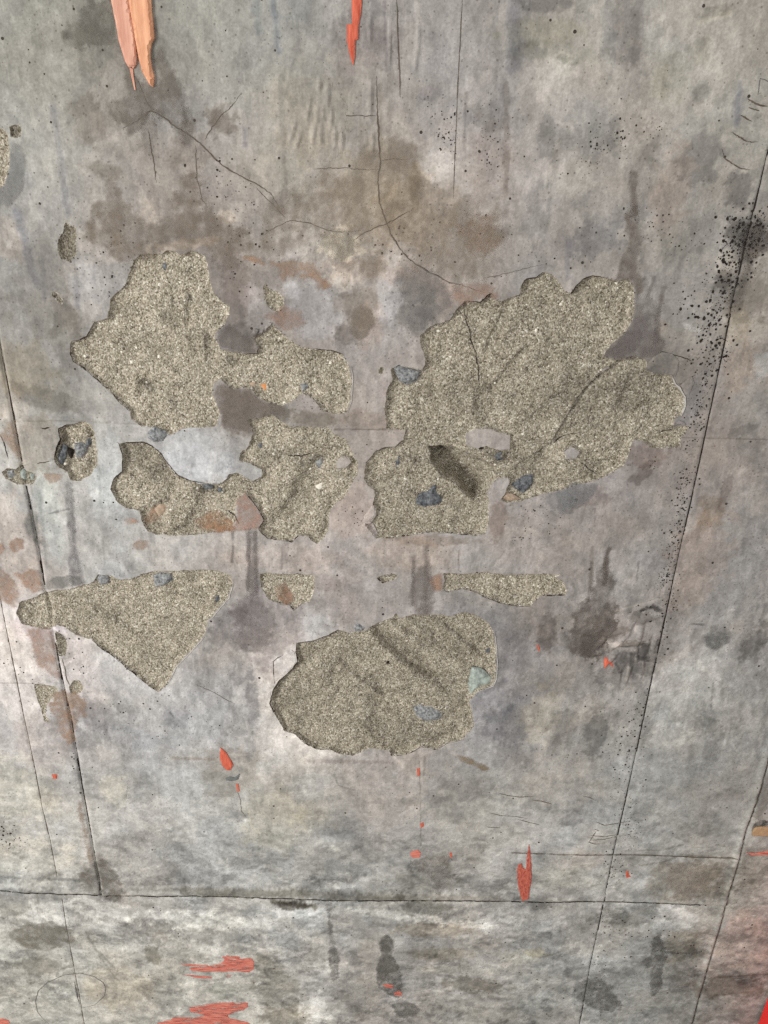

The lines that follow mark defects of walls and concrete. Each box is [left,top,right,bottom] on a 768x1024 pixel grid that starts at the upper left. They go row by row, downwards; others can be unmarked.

damp [121,70,183,134]
crack [124,0,544,290]
damp [320,224,363,259]
spalling [70,250,694,544]
spalling [54,421,98,481]
spalling [260,573,315,611]
spalling [442,572,567,607]
damp [598,548,614,590]
spalling [16,570,233,692]
damp [570,603,617,657]
spalling [264,612,498,756]
damp [377,936,416,1016]